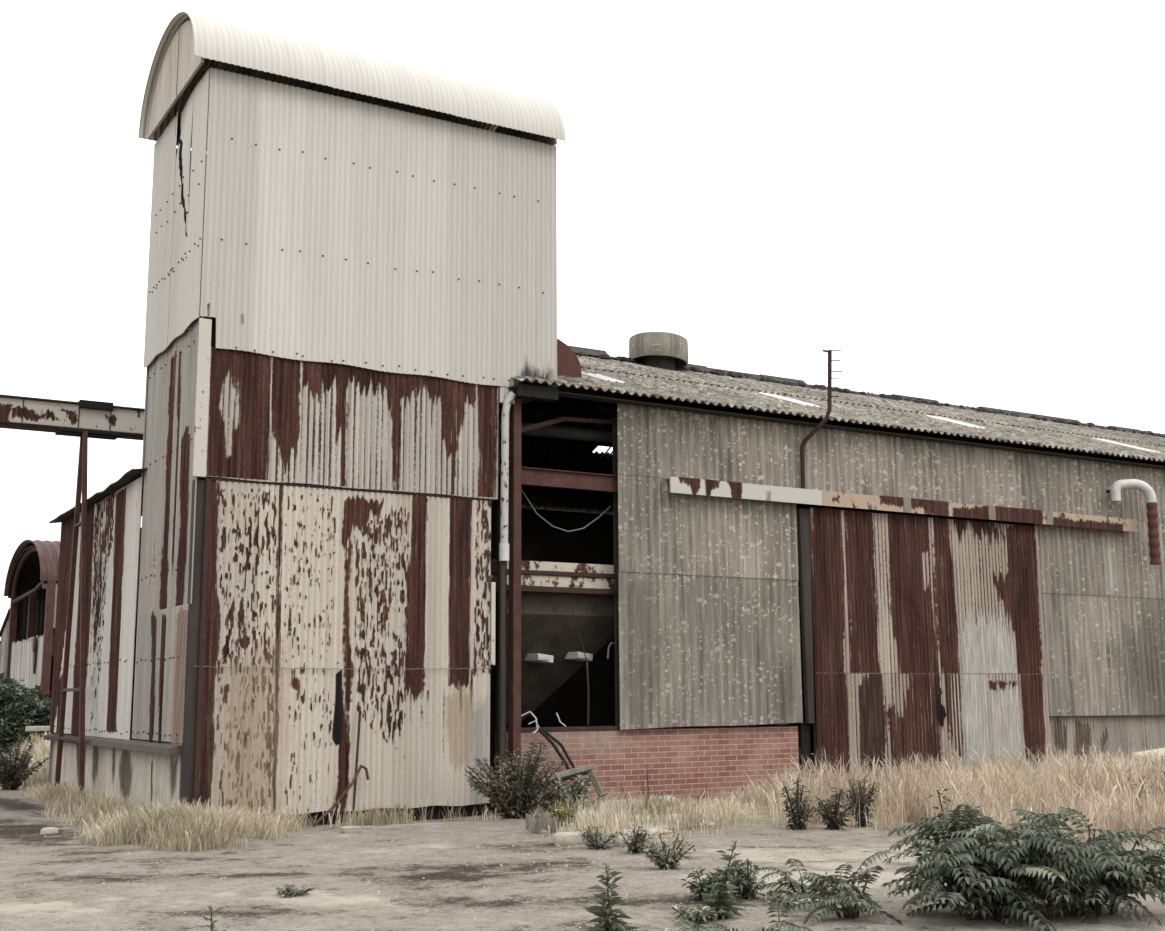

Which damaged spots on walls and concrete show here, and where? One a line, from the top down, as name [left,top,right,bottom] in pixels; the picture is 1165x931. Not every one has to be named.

crack [175,113,189,236]
corrosion [0,403,78,425]
corrosion [49,487,126,736]
corrosion [149,349,190,746]
corrosion [198,347,498,815]
corrosion [679,477,742,499]
corrosion [810,495,1123,785]